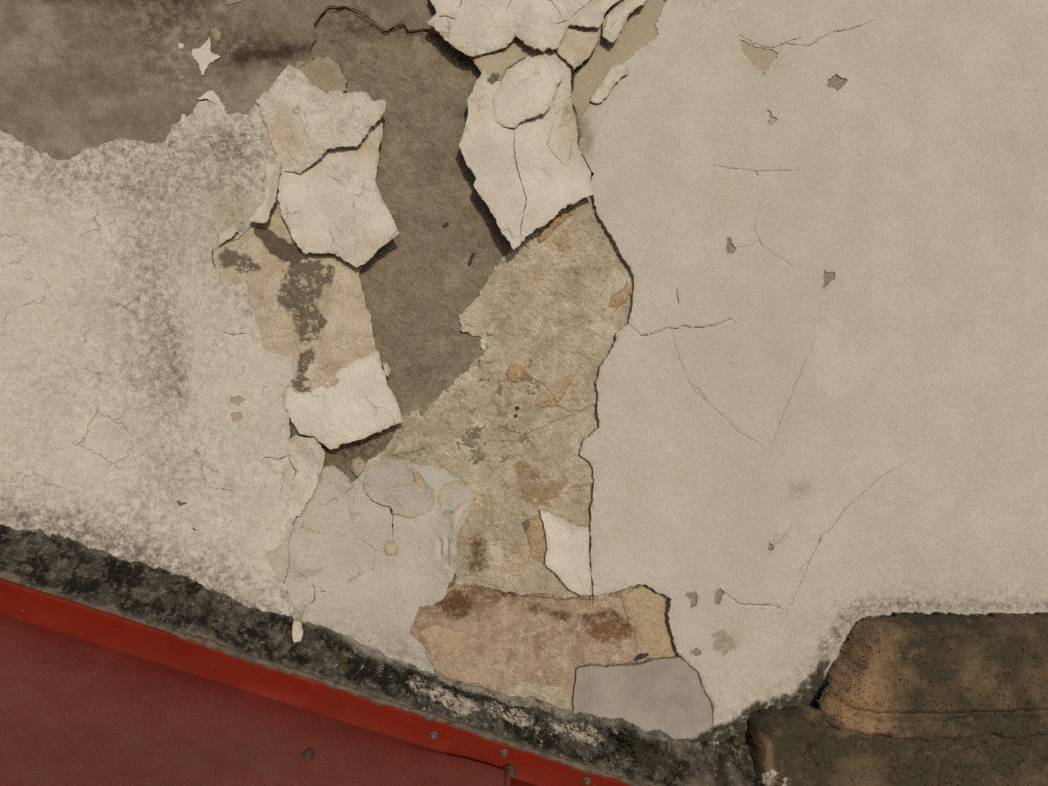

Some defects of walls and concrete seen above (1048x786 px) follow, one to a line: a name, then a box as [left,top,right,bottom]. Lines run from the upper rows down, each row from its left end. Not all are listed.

crack [742,19,875,48]
peeling [826,74,847,91]
crack [713,164,798,175]
flaking render [213,0,678,711]
crack [629,292,815,449]
damp [516,461,564,505]
crack [725,460,910,624]
peeling [686,592,697,607]
damp [401,668,603,743]
damp [692,646,830,745]
damp [753,769,790,786]